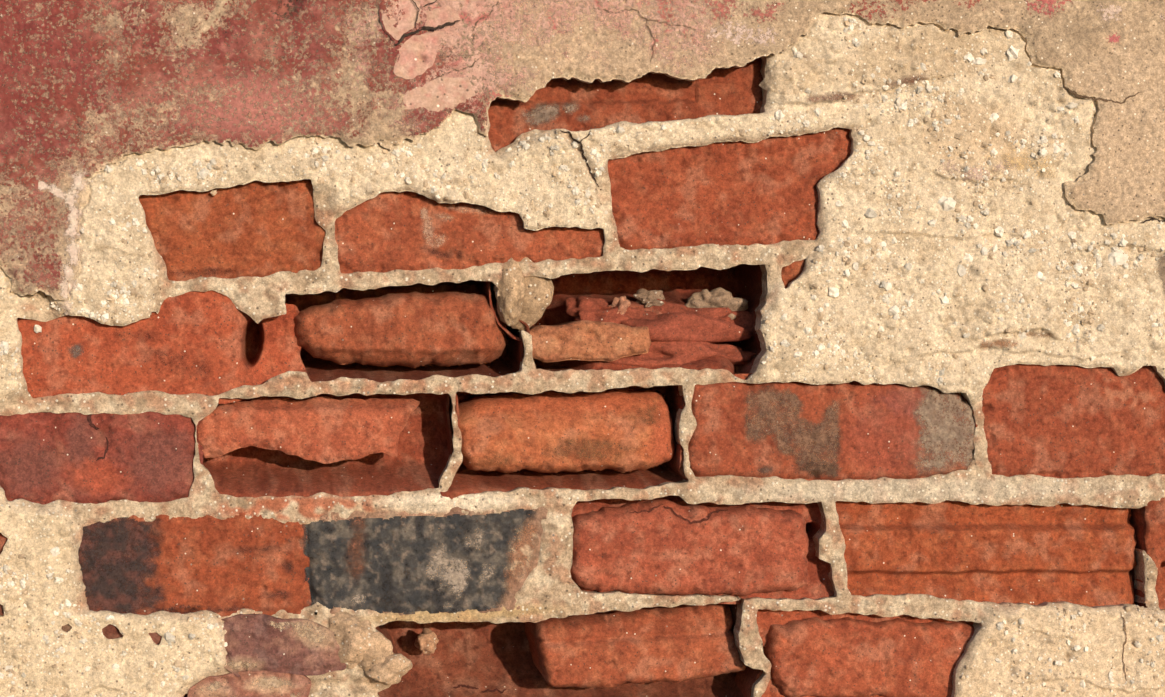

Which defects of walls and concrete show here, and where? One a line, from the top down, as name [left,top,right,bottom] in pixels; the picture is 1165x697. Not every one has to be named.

crack [593,8,697,63]
spalling [0,0,1165,416]
spalling [0,486,228,697]
spalling [203,385,1165,697]